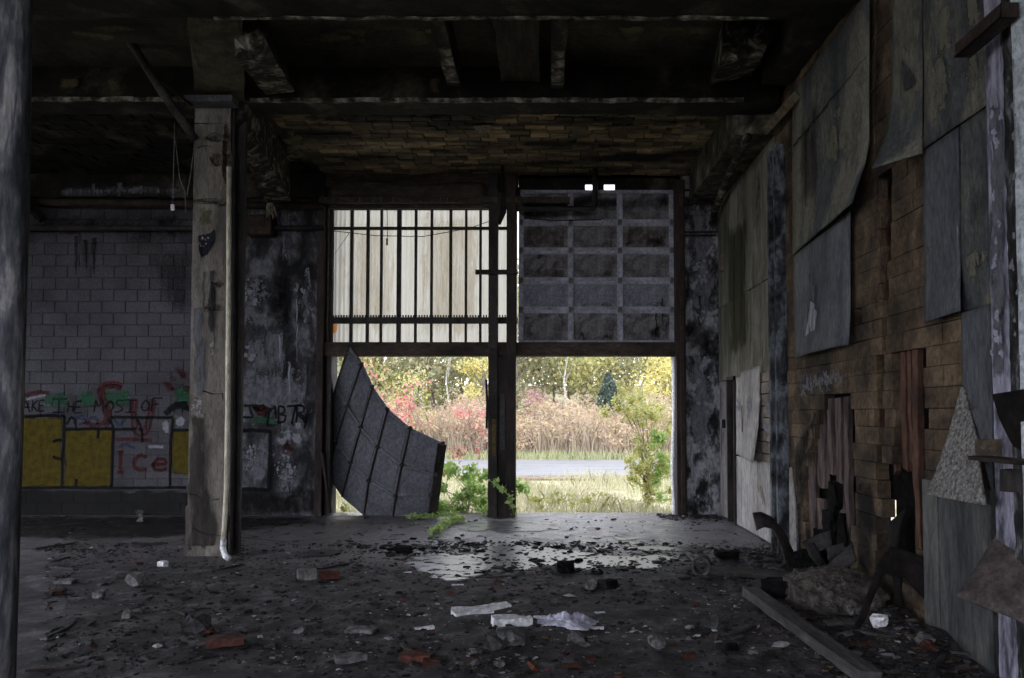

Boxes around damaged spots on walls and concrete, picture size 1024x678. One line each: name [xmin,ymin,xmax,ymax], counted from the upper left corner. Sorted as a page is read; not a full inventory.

peeling [964,102,1020,377]